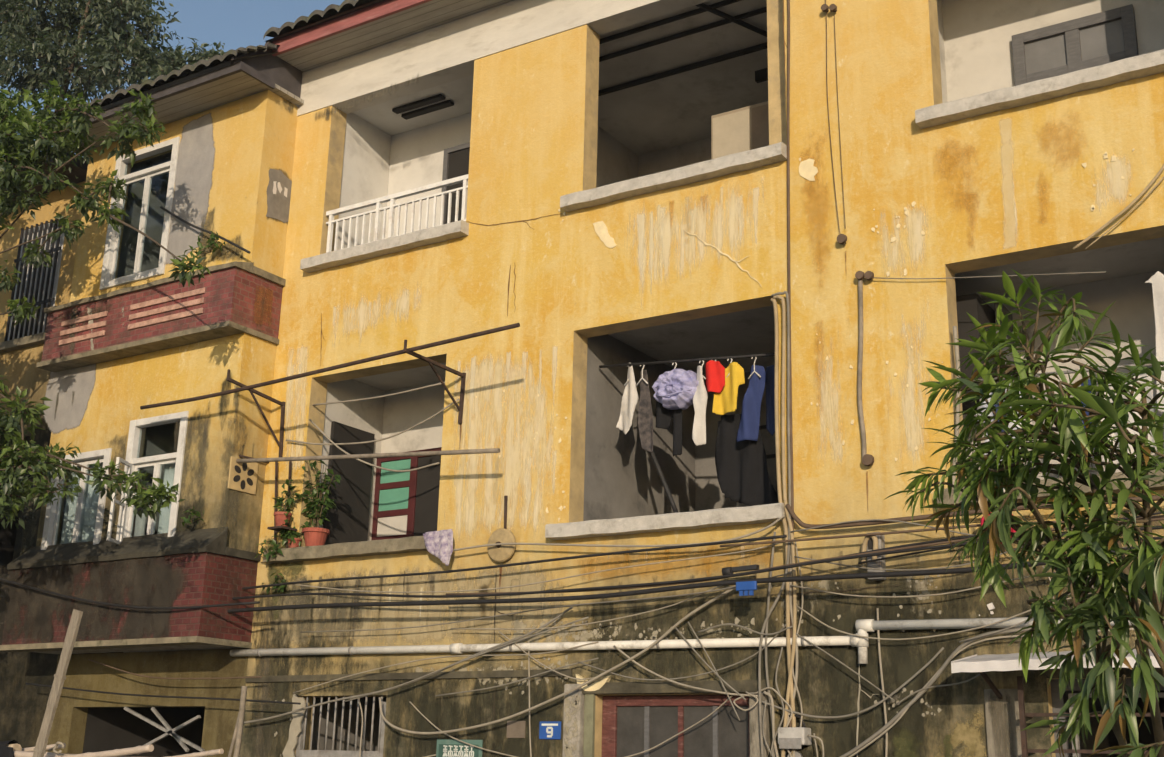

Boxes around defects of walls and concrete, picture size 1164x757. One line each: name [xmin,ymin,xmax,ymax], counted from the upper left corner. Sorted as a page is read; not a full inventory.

flaking render [266,168,292,224]
peeling [593,221,617,248]
damp [637,188,759,283]
damp [176,414,208,532]
damp [217,420,244,534]
damp [583,598,619,666]
damp [632,573,1030,757]